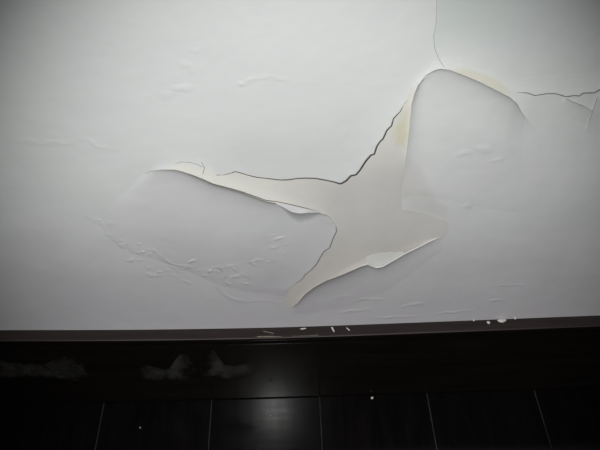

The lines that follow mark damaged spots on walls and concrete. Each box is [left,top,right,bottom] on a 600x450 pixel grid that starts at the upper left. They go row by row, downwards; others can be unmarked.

peeling [102,80,449,314]
crack [510,72,600,136]